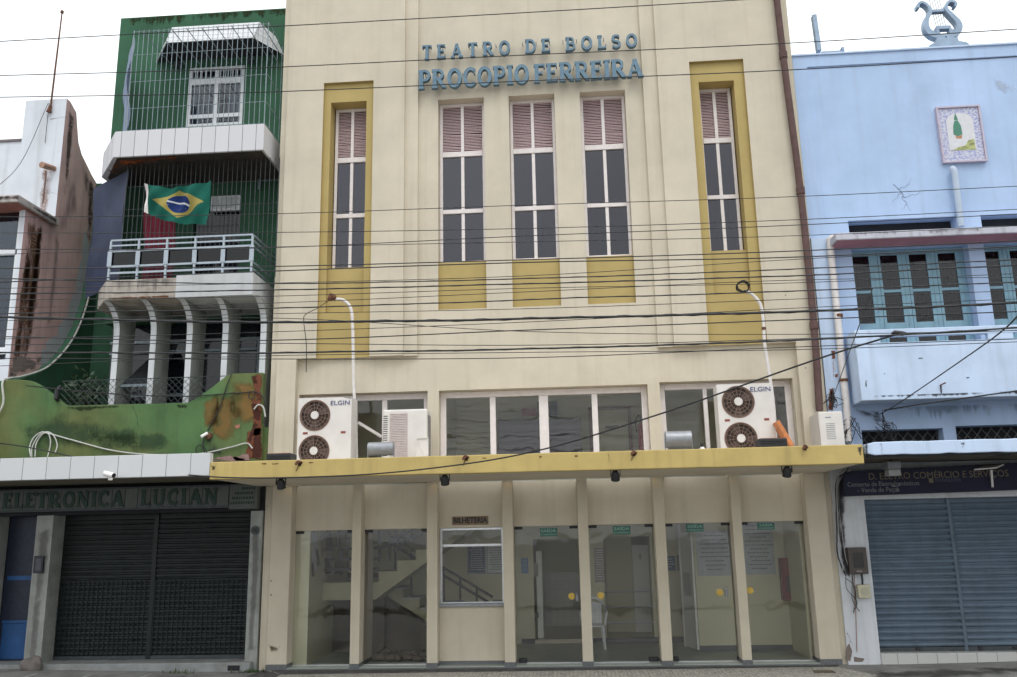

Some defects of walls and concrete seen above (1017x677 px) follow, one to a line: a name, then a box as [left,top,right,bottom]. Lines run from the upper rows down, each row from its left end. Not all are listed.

leakage [85,176,94,238]
leakage [15,225,42,358]
leakage [28,422,164,448]
peeling [205,374,278,464]